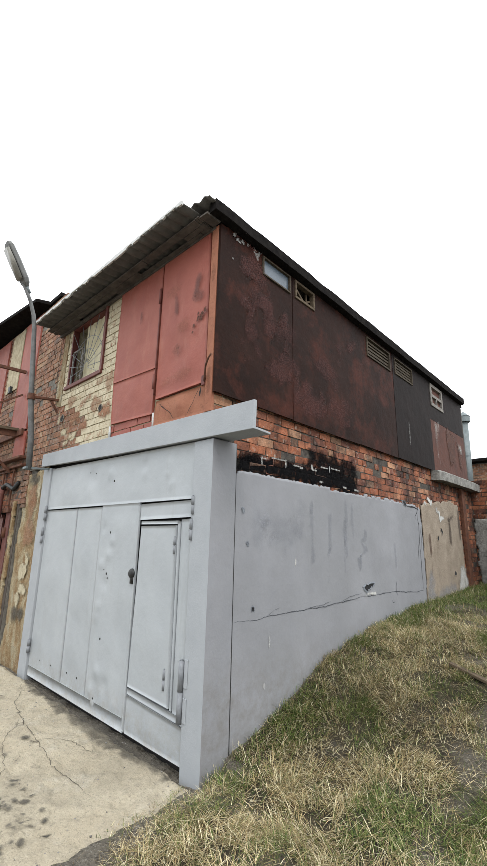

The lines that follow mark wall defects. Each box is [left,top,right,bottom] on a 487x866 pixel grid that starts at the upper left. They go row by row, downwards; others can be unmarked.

peeling [57,394,110,445]
flaking render [11,554,28,621]
crack [235,506,424,623]